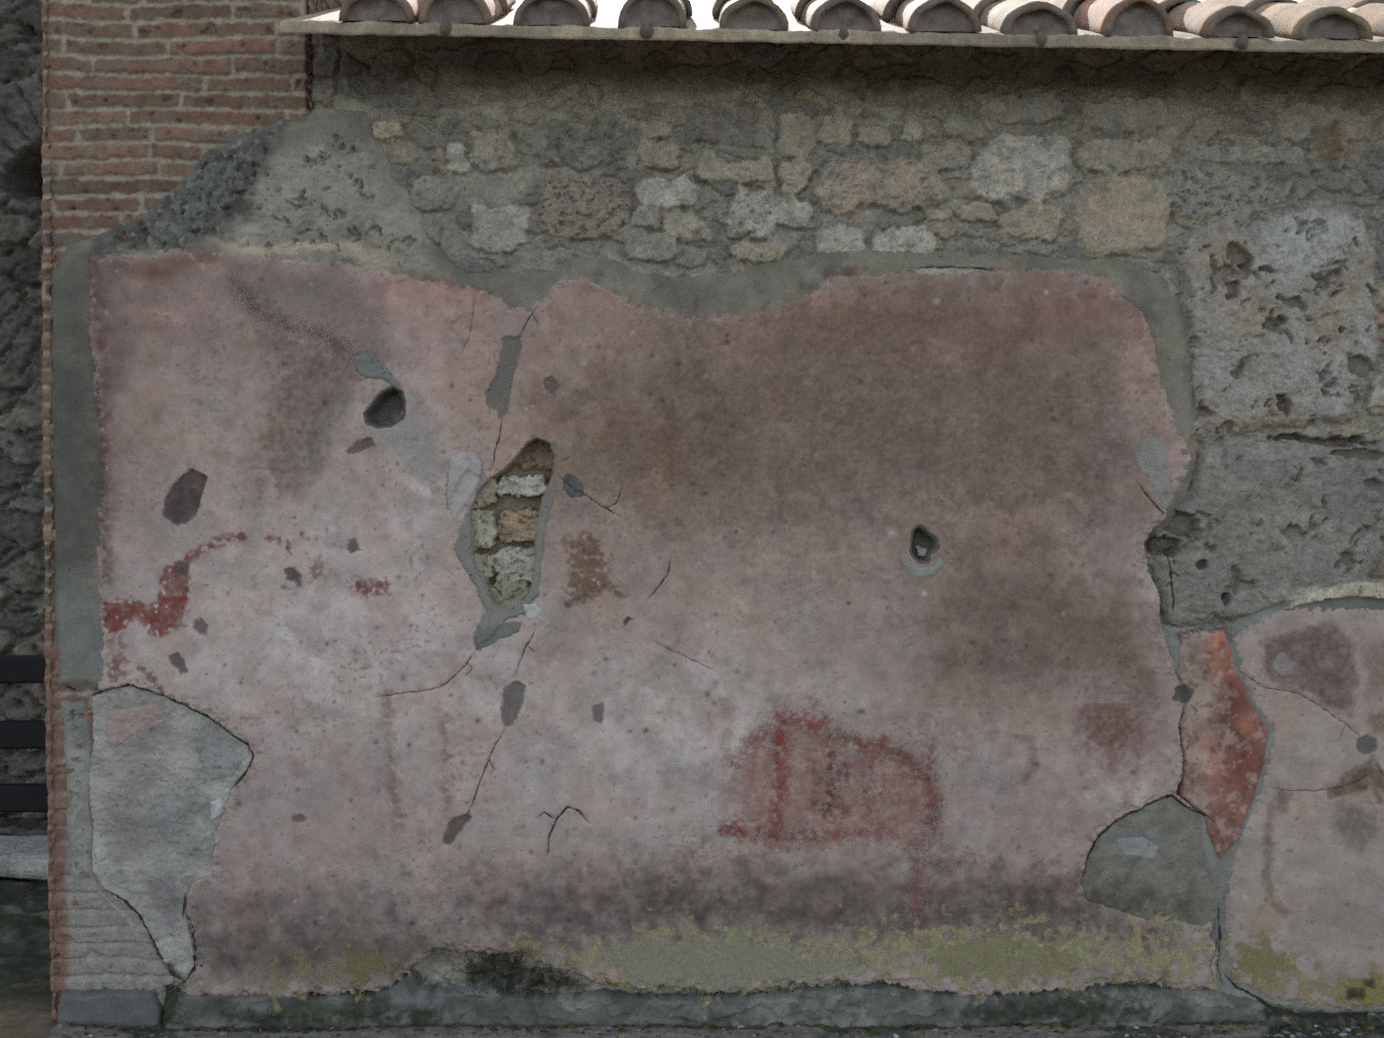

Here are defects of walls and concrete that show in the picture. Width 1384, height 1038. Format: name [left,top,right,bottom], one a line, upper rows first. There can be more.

spalling [165,470,207,524]
spalling [89,684,255,982]
crack [468,731,504,814]
crack [539,806,590,854]
spalling [1080,795,1217,926]
crack [1240,671,1384,791]